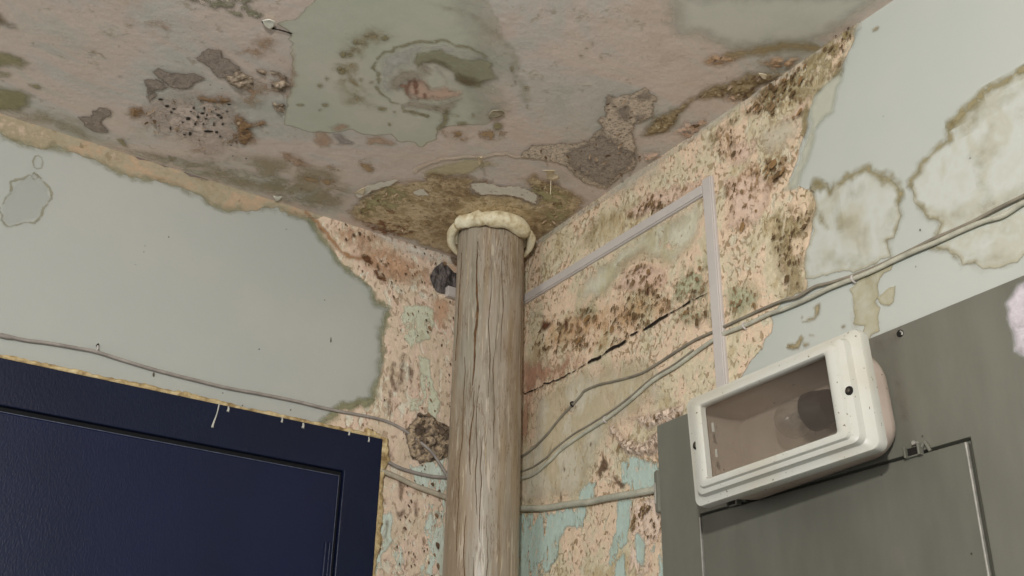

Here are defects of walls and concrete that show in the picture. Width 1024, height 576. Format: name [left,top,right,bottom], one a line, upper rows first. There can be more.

flaking render [130,49,290,160]
leakage [318,34,496,130]
leakage [644,26,852,149]
leakage [351,160,581,253]
leakage [776,65,1024,339]
peeling [0,108,457,576]
crack [523,293,707,394]
peeling [413,24,857,576]